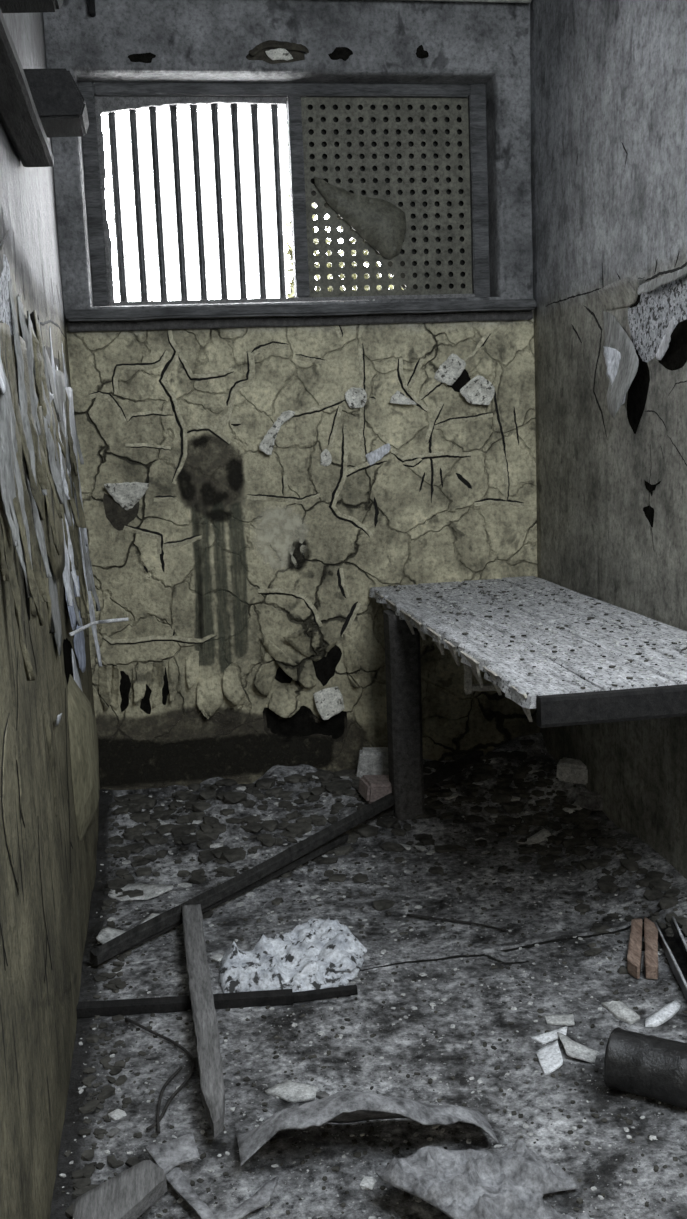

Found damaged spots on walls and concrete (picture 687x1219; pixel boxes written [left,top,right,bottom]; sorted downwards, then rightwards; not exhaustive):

peeling [598,265,687,434]
crack [103,628,217,645]
peeling [0,244,361,742]
water stain [191,503,310,673]
crack [89,325,524,573]
crack [258,568,361,637]
spalling [643,479,661,528]